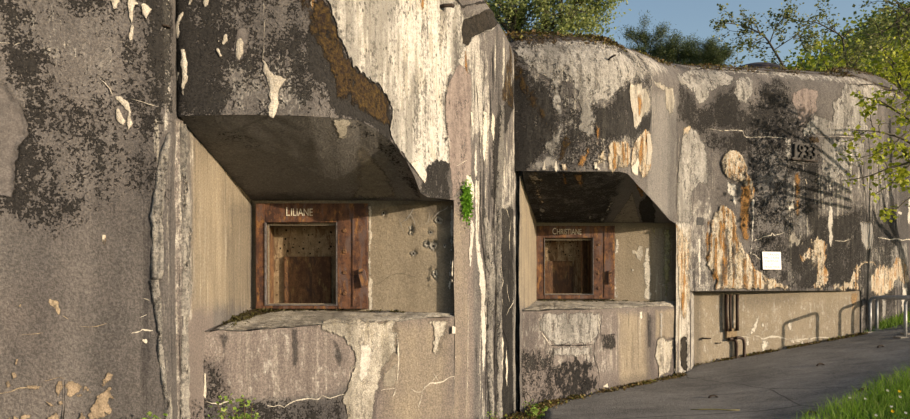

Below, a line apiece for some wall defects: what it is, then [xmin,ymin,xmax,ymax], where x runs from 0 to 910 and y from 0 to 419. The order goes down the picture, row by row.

peeling [0,83,29,197]
spalling [328,0,496,198]
spalling [515,44,753,155]
peeling [26,372,114,419]
crack [267,394,345,408]
spalling [227,310,454,419]
leakage [546,357,597,399]